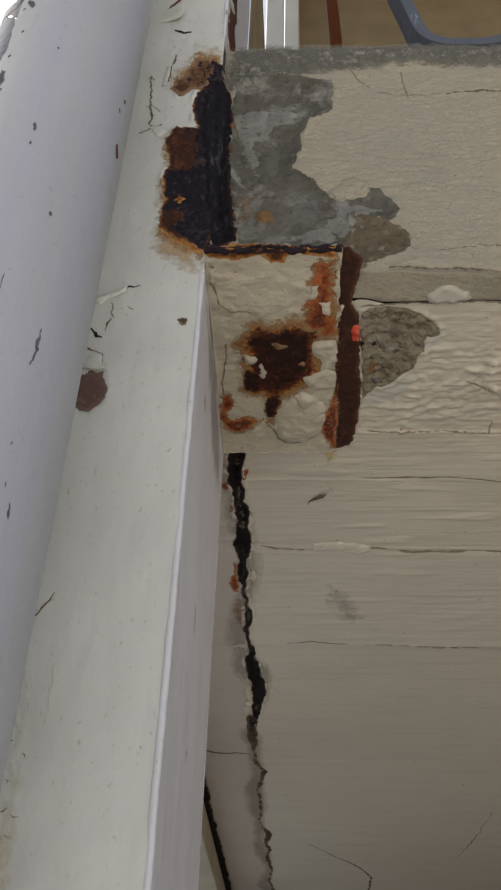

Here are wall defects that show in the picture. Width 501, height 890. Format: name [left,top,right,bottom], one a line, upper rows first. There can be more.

spalling [229,75,411,269]
rust [156,51,363,460]
peeling [427,285,472,305]
peeling [75,347,108,412]
spalling [359,307,448,406]
crack [371,546,501,554]
crack [206,453,312,890]
crack [383,642,474,650]